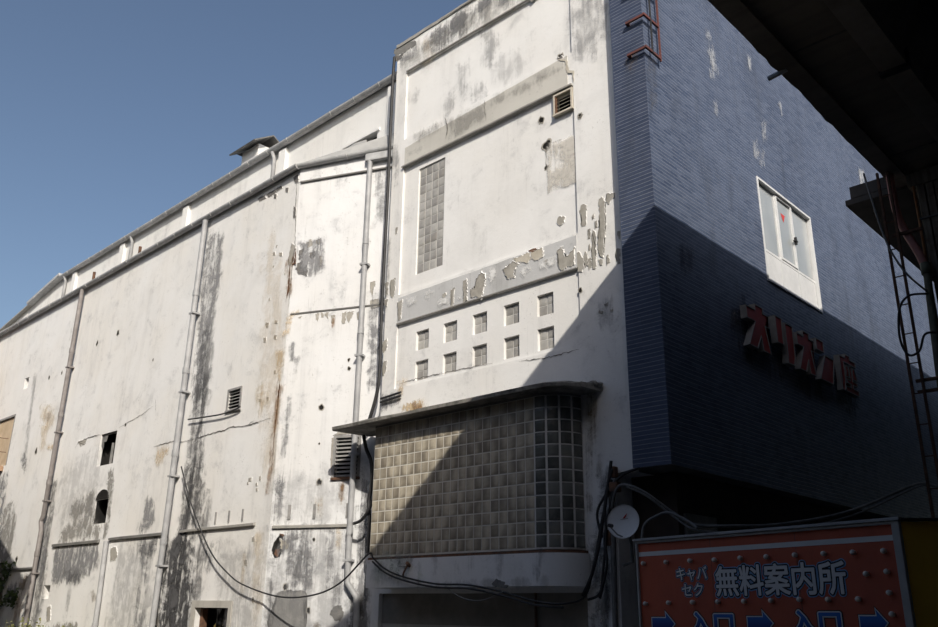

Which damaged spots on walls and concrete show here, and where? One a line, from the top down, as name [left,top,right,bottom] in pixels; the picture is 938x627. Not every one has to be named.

damp [431,12,472,50]
peeling [258,174,324,298]
peeling [438,192,621,308]
damp [192,234,223,399]
peeling [315,310,359,324]
peeling [370,277,416,321]
crack [75,435,98,448]
crack [155,418,270,447]
damp [0,474,16,580]
damp [137,469,211,627]
spalling [272,534,289,558]